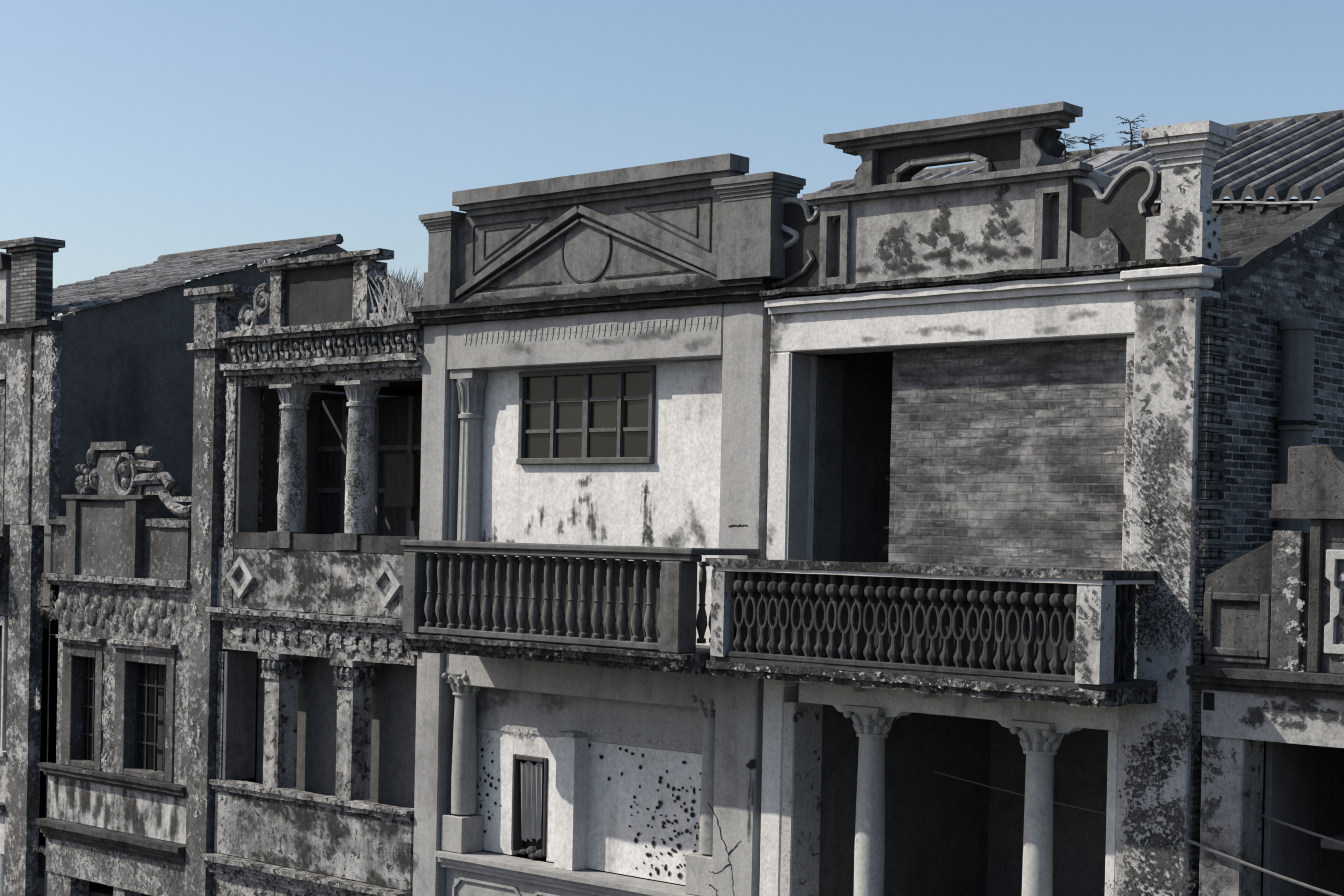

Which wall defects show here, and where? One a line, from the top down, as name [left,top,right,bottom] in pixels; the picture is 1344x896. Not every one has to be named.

spalling [874,185,1026,274]
spalling [1152,204,1217,265]
damp [482,506,546,543]
damp [558,476,606,541]
damp [640,480,652,547]
peeling [477,726,551,833]
spalling [584,728,703,878]